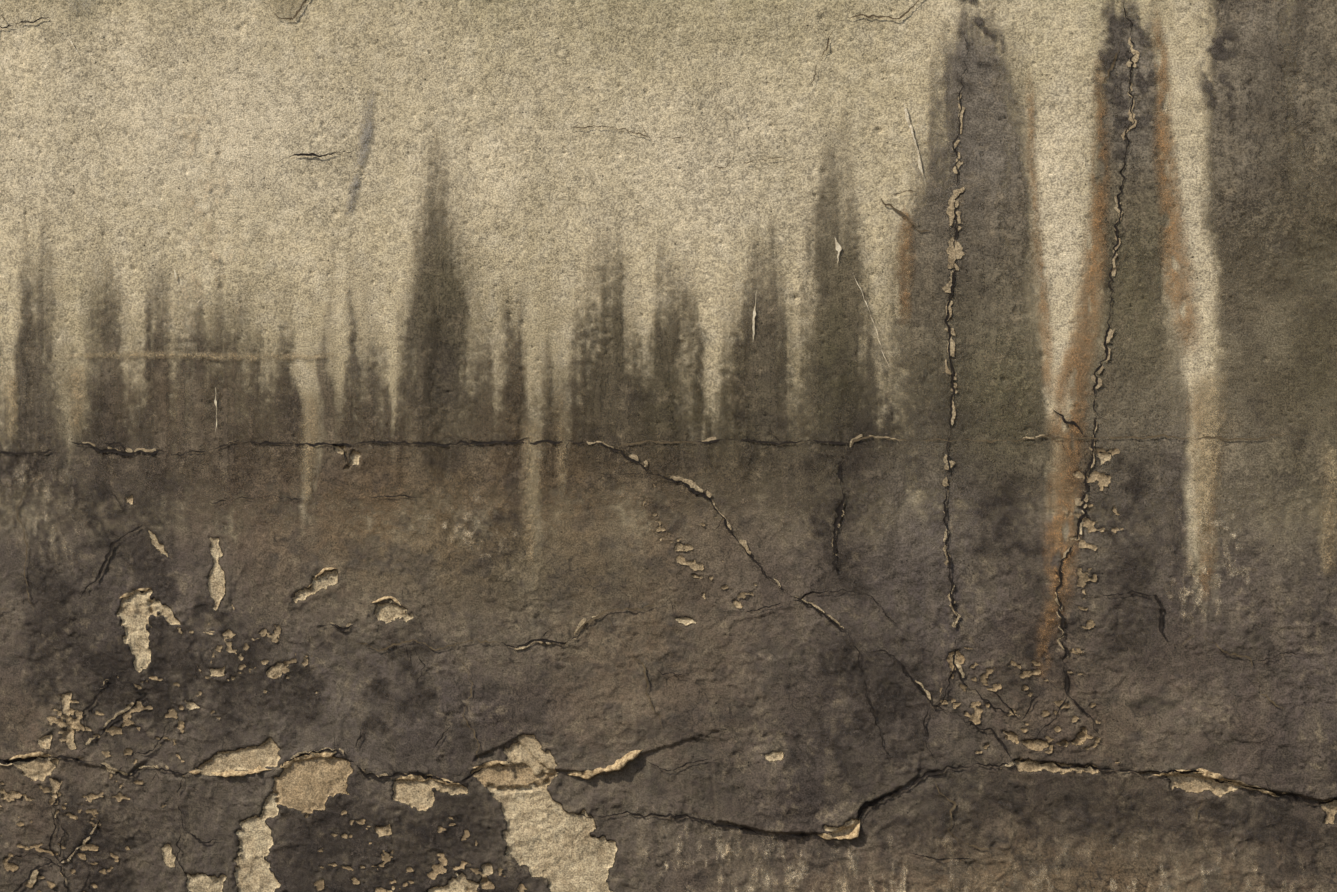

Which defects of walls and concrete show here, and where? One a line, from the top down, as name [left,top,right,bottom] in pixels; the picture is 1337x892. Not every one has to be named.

crack [0,15,49,28]
damp [1069,0,1337,564]
crack [69,441,164,456]
damp [0,0,1053,724]
crack [171,0,1203,852]
corrosion [1050,185,1105,590]
peeling [0,537,393,892]
peeling [372,596,413,624]
peeling [375,734,617,892]
peeling [940,647,1049,725]
peeling [1000,700,1100,774]
crack [1211,774,1337,805]